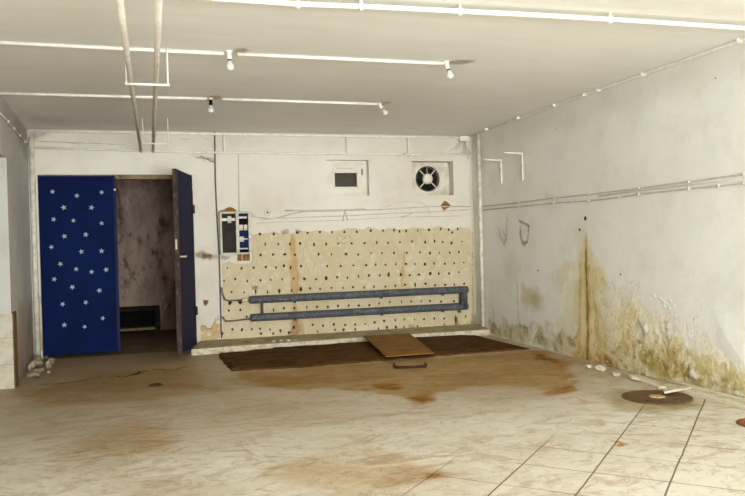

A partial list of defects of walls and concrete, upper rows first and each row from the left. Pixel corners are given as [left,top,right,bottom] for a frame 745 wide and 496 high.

peeling [200,317,295,340]
spalling [384,227,465,288]
damp [527,241,581,343]
flaking render [595,277,745,398]